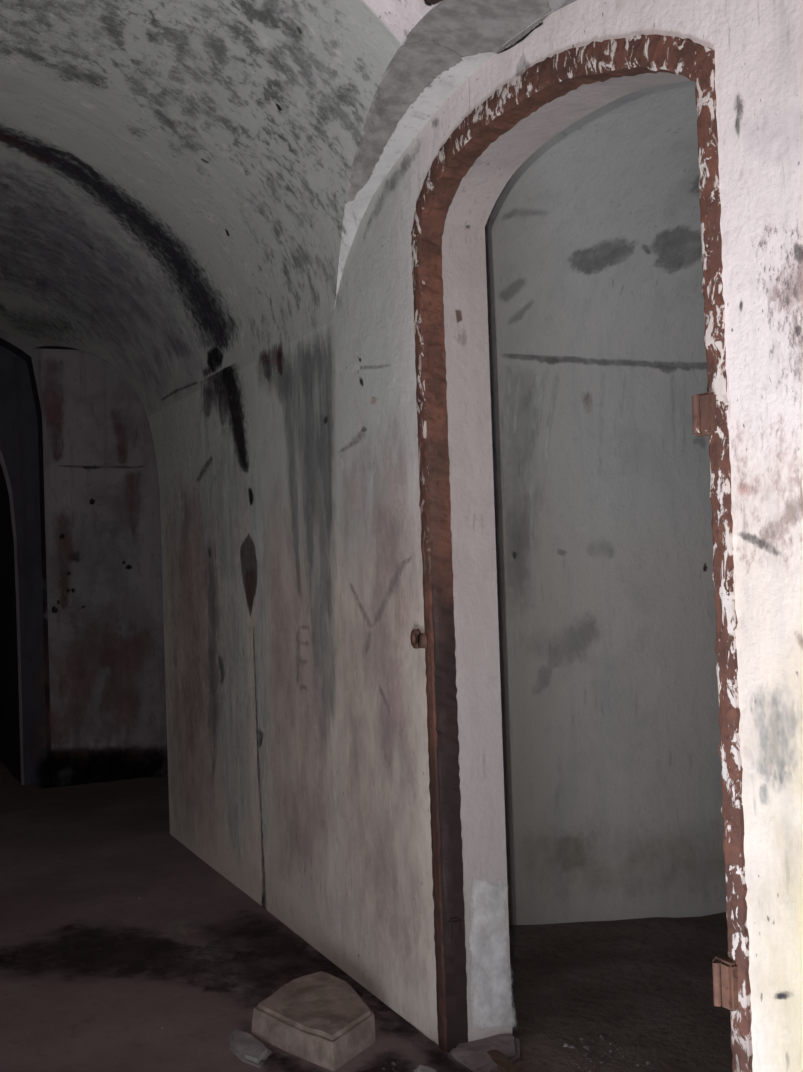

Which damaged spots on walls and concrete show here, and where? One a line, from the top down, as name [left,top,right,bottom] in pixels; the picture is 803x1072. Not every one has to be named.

water stain [268,340,332,658]